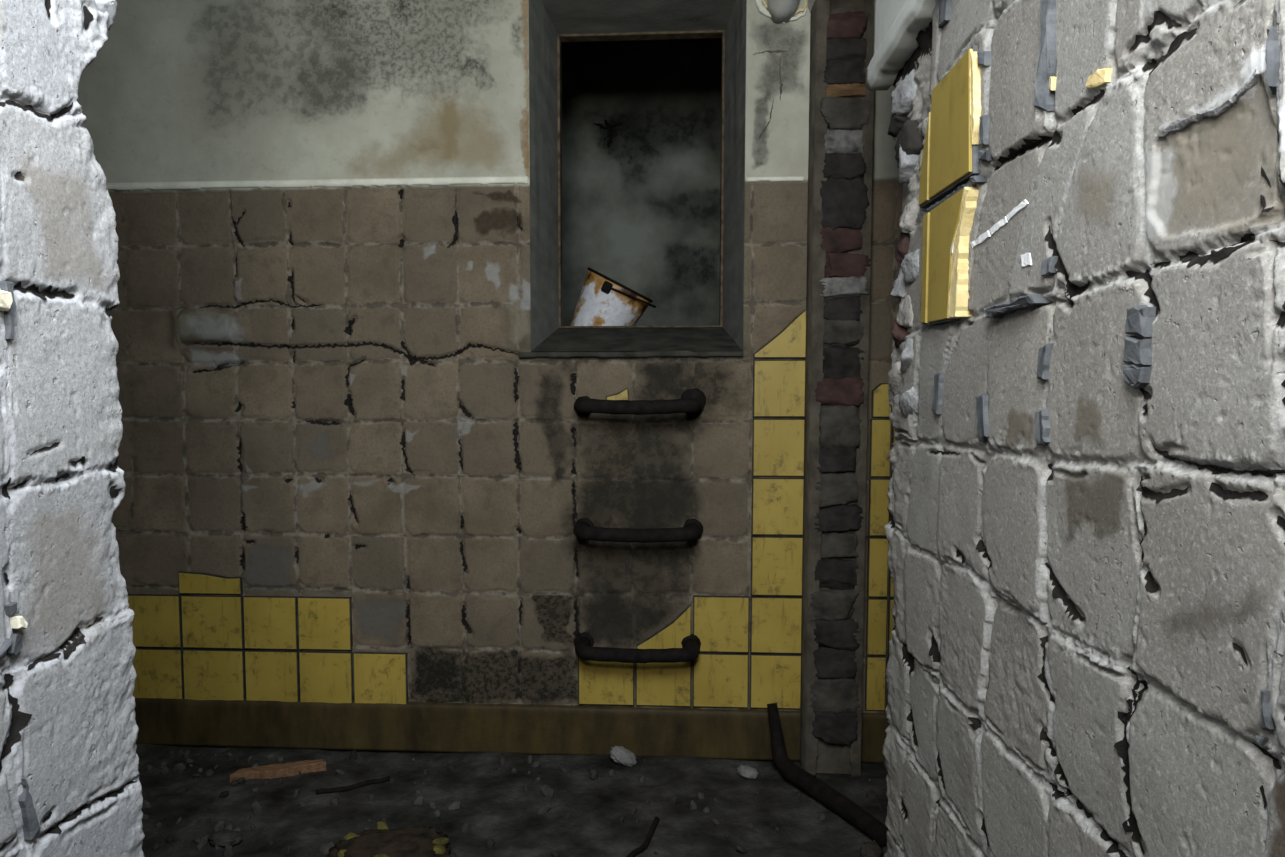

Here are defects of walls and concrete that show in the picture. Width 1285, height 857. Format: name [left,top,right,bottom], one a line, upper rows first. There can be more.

spalling [95,0,117,30]
damp [756,25,802,166]
crack [1129,10,1197,75]
spalling [888,69,924,418]
crack [1125,234,1285,314]
flaking render [809,11,871,746]
damp [532,357,728,643]
damp [1067,475,1122,536]
crack [1136,388,1285,592]
crack [0,616,103,772]
damp [411,648,578,703]
crack [1037,563,1148,857]